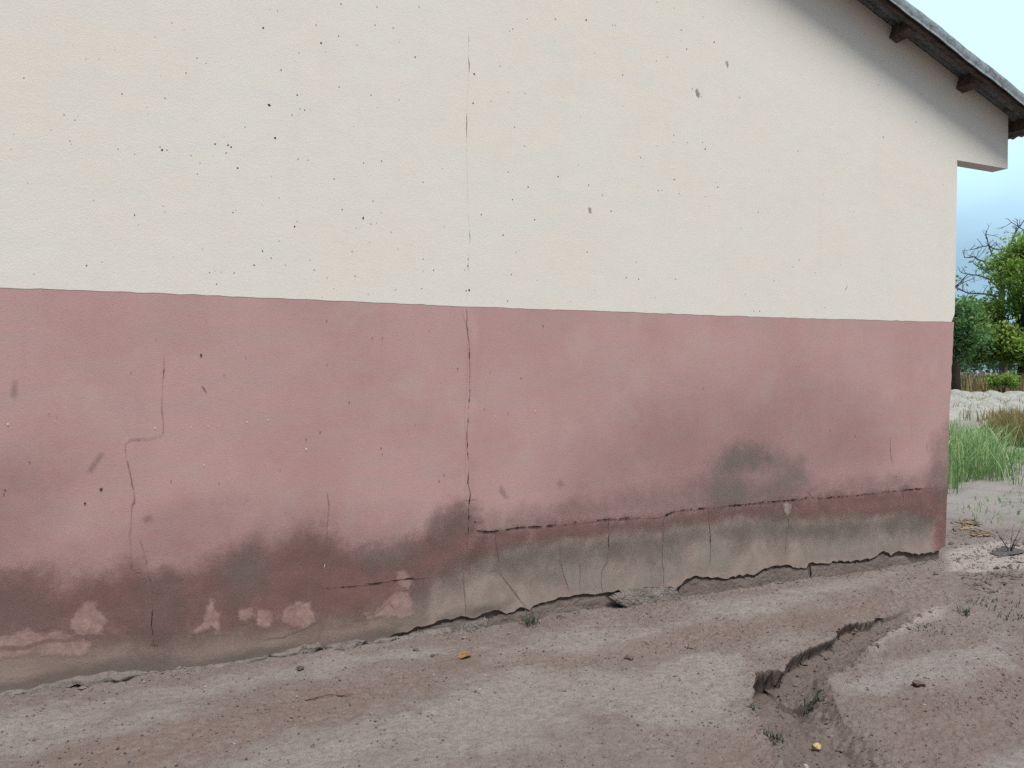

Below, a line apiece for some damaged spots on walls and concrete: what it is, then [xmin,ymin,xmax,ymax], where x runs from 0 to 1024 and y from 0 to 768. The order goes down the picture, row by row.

crack [125,370,164,631]
crack [263,494,431,641]
water stain [0,491,947,642]
crack [462,310,937,605]